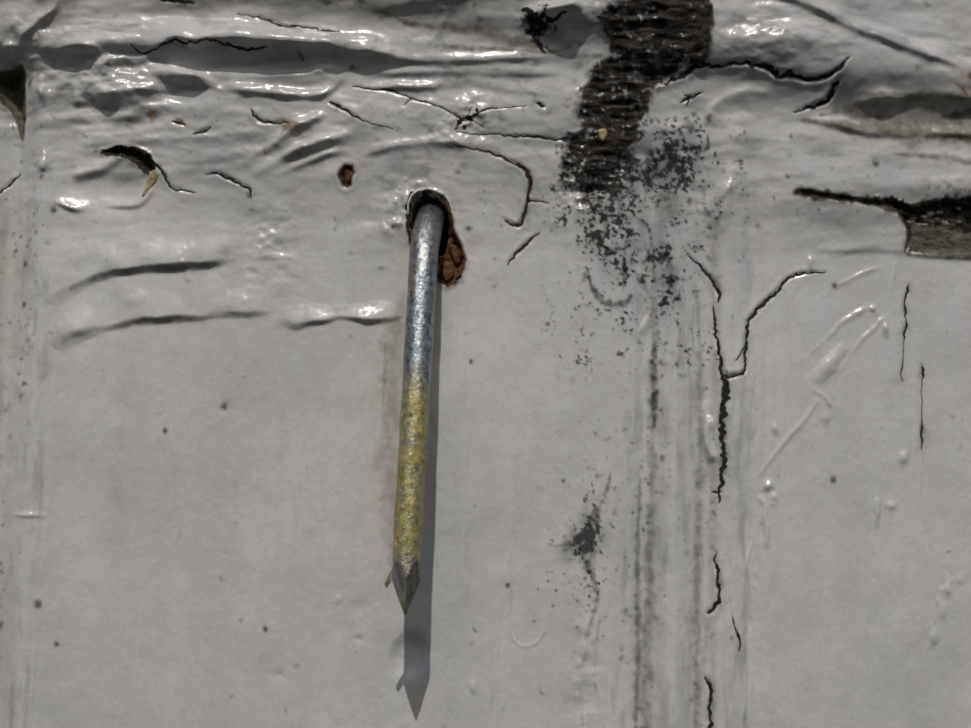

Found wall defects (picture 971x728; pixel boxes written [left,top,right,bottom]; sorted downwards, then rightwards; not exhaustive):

crack [161,0,194,8]
peeling [521,4,567,53]
peeling [561,0,714,202]
peeling [101,145,159,196]
crack [329,86,566,265]
corrosion [437,201,467,287]
peeling [793,187,971,258]
crack [689,256,826,504]
crack [900,285,925,450]
crack [707,553,741,651]
crack [704,676,714,728]